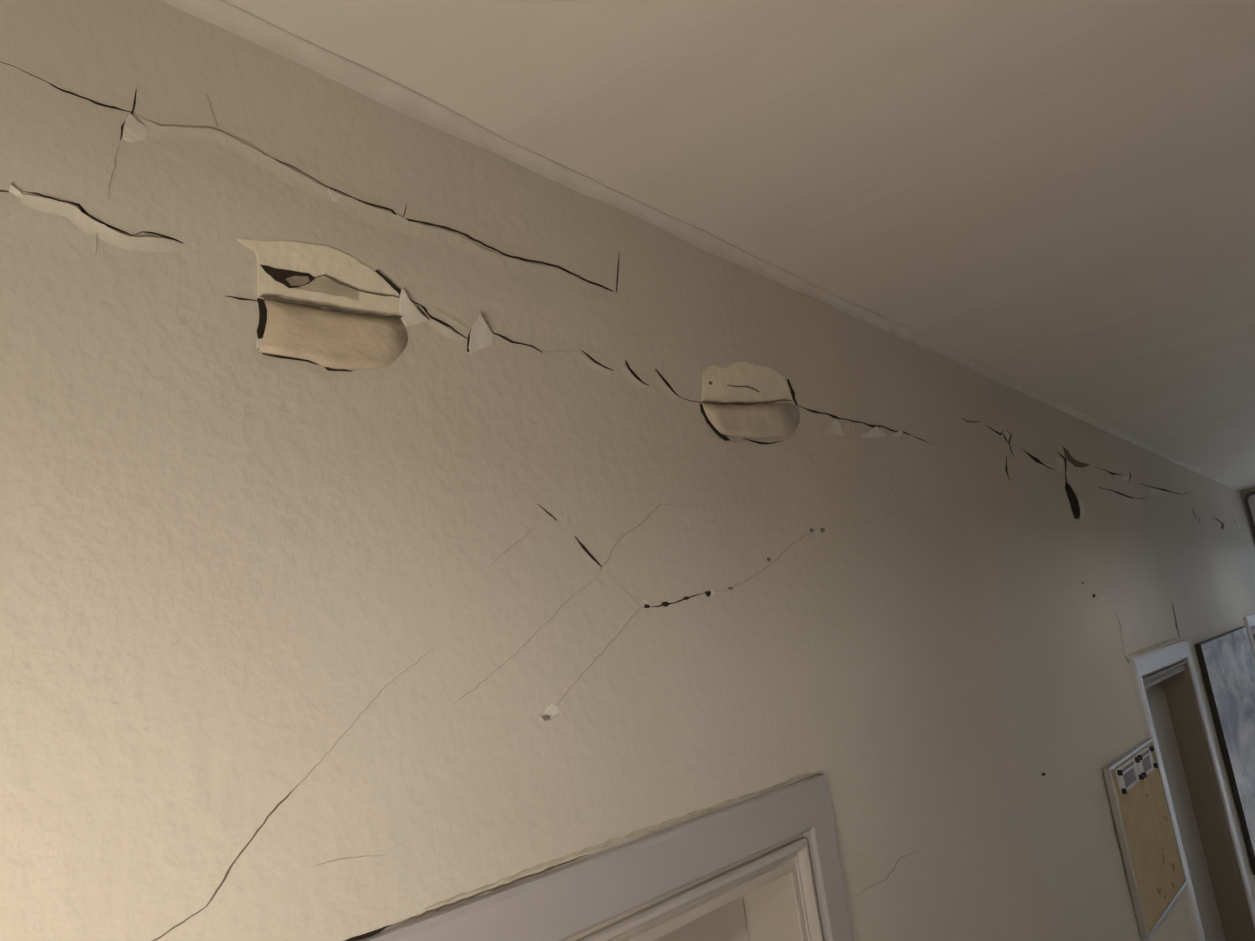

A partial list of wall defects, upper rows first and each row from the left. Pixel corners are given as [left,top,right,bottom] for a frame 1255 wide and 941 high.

peeling [227,239,408,372]
crack [399,289,702,403]
peeling [700,362,800,444]
crack [797,405,932,444]
crack [962,418,1055,480]
crack [1096,467,1236,530]
crack [458,504,688,721]
crack [152,649,433,941]
crack [344,771,823,941]